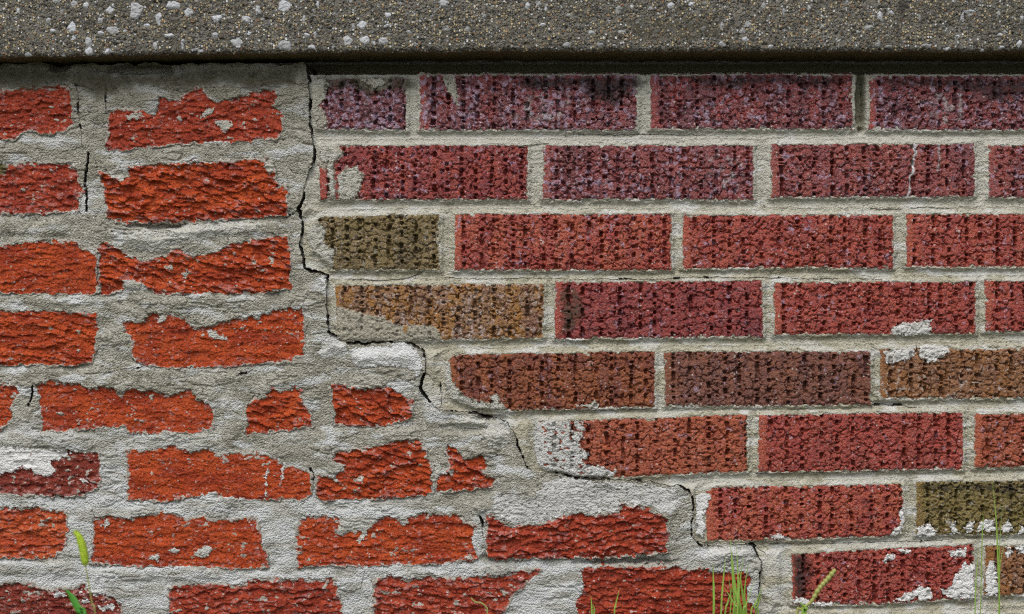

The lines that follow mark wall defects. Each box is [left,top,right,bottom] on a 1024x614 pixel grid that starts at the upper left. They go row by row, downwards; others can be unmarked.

crack [74,81,107,211]
crack [232,64,979,602]
spalling [488,420,683,527]